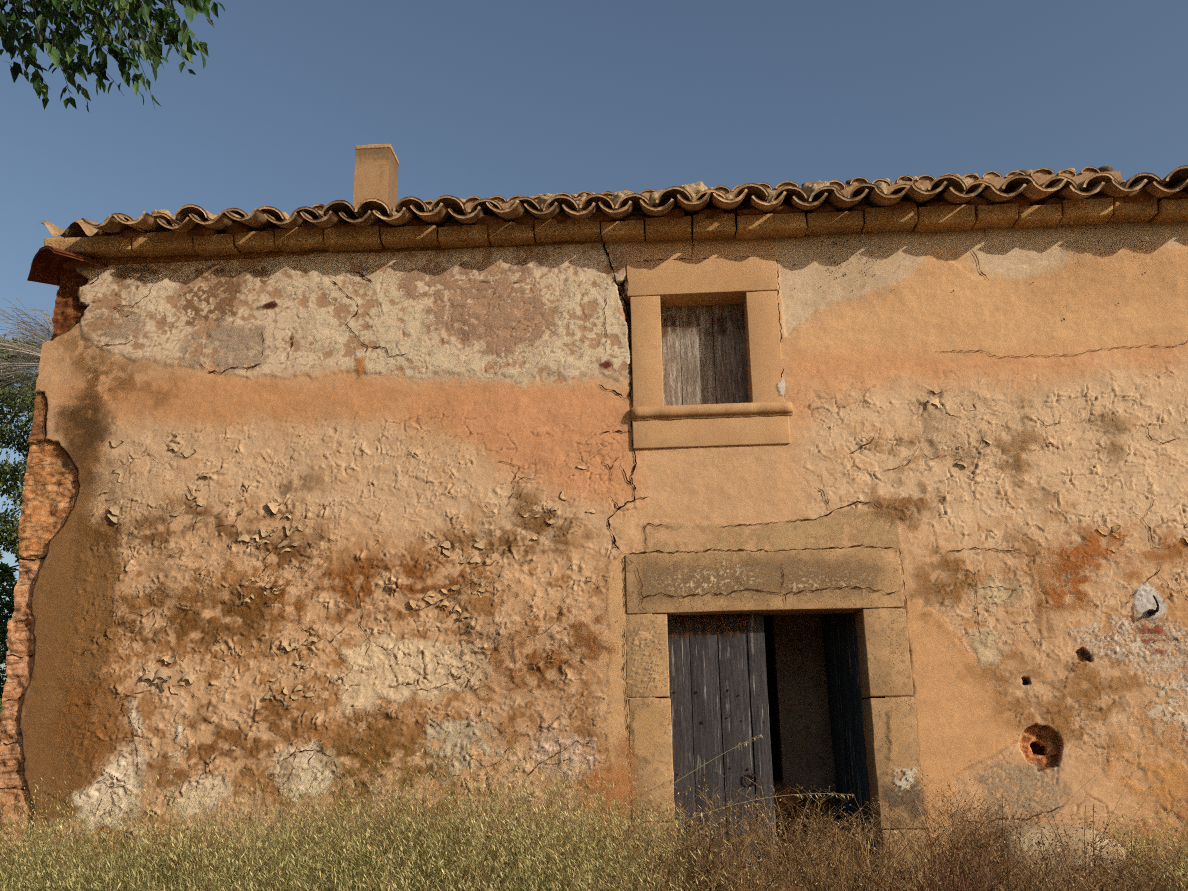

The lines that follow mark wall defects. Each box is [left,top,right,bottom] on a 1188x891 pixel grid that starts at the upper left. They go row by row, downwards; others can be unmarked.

spalling [50,271,88,341]
crack [200,331,293,373]
crack [332,270,406,357]
crack [936,342,1188,358]
crack [515,237,907,818]
spalling [0,392,80,855]
leakage [65,519,118,792]
flaking render [332,632,494,714]
crack [411,674,481,691]
flaking render [1072,584,1188,742]
flaking render [73,698,146,831]
spalling [1020,725,1061,772]